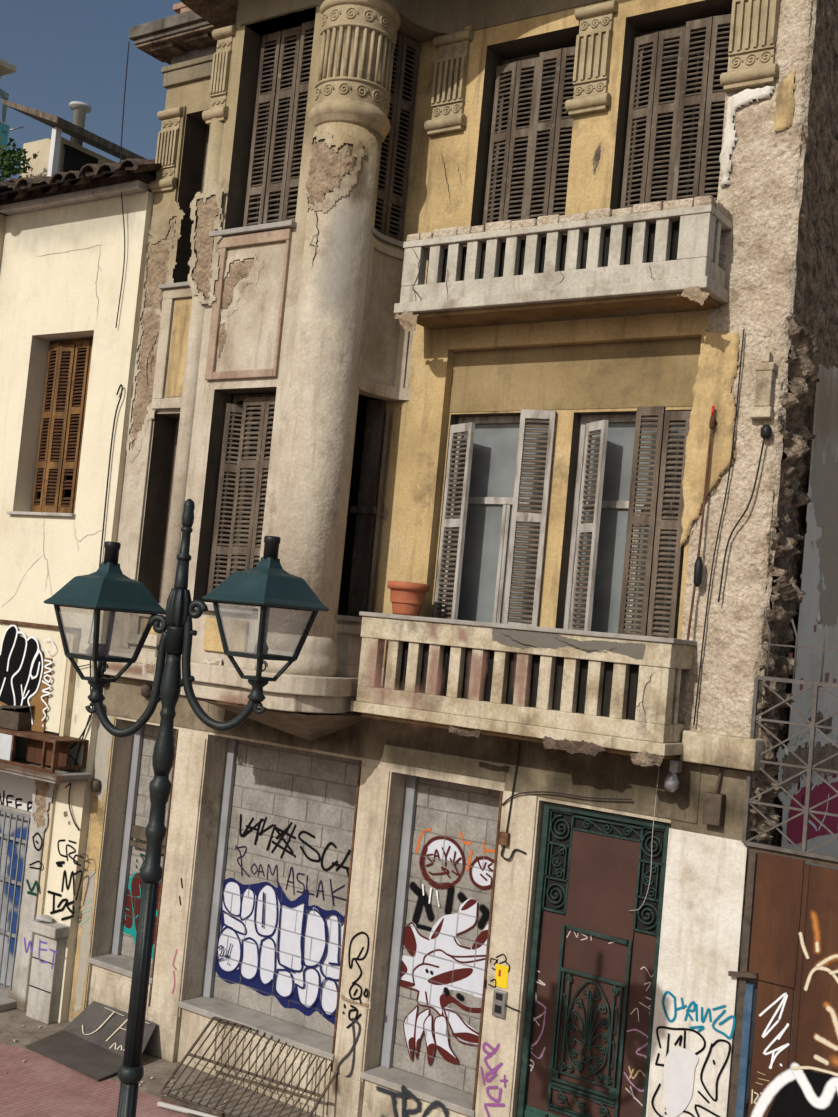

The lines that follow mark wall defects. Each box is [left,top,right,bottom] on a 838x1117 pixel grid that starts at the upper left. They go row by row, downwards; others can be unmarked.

flaking render [306,130,366,213]
flaking render [719,68,797,188]
crack [309,204,319,266]
flaking render [126,182,265,462]
flaking render [680,330,740,547]
peeling [810,443,838,632]
peeling [492,627,646,659]
flaking render [543,736,606,756]